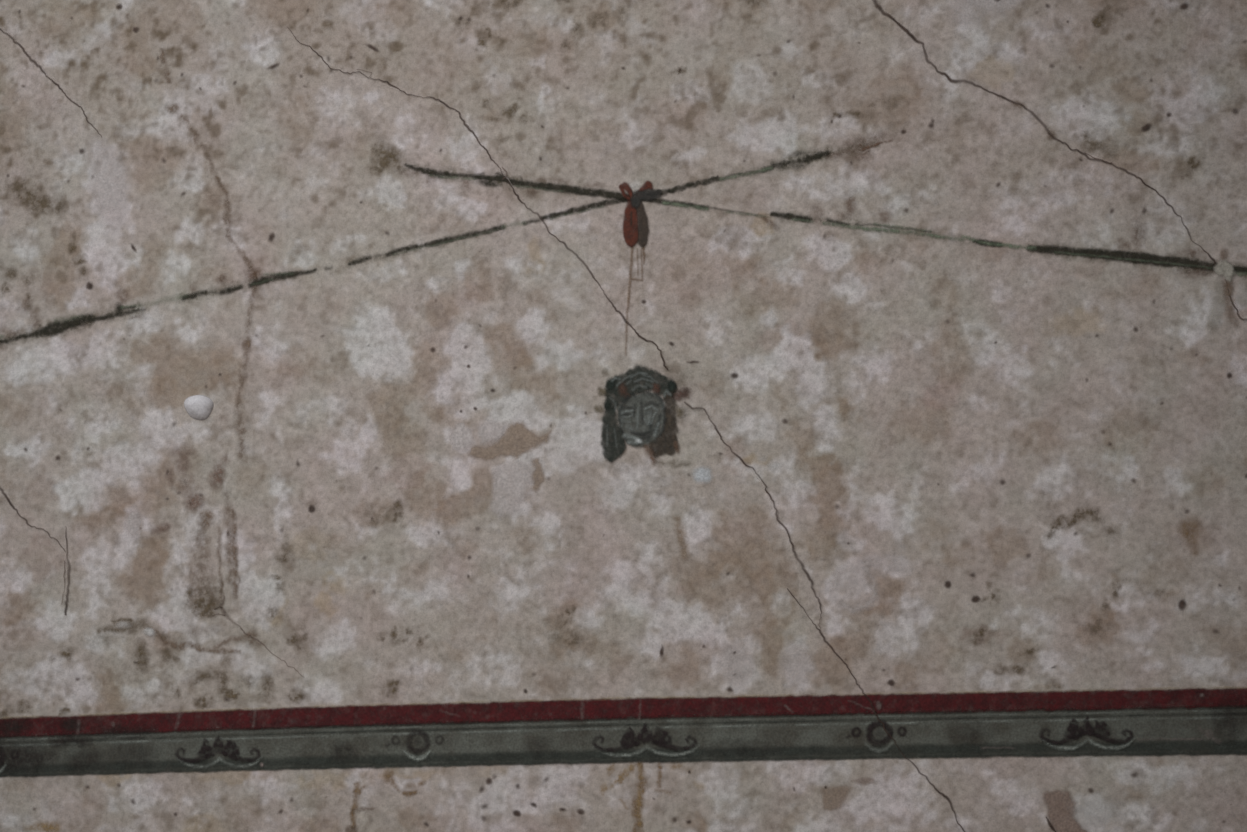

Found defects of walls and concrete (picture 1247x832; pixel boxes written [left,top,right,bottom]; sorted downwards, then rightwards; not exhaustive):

crack [0,29,99,134]
crack [289,29,566,246]
crack [874,0,1247,320]
crack [587,268,668,370]
crack [2,491,69,615]
crack [686,403,965,832]